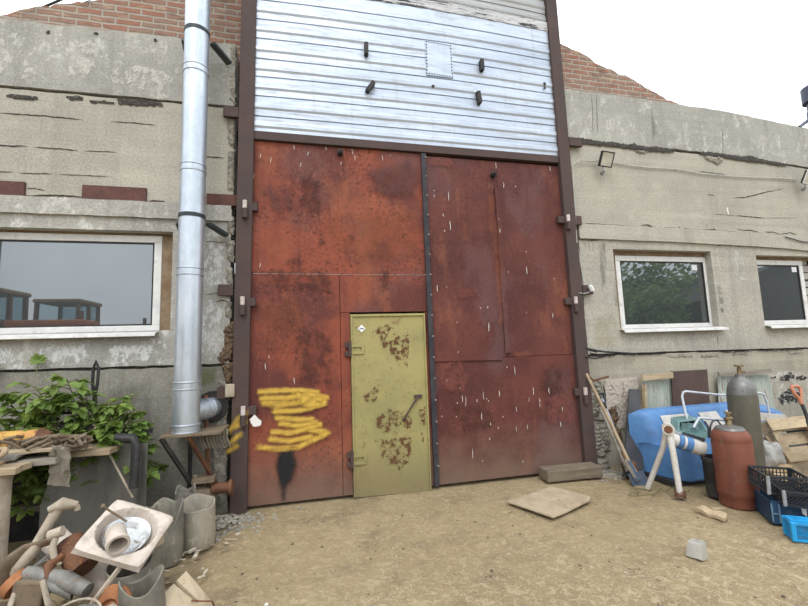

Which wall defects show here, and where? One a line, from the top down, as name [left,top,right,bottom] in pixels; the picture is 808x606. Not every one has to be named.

crack [6,112,82,120]
crack [0,144,110,152]
crack [0,171,108,197]
crack [706,189,796,247]
peeling [36,344,89,366]
peeling [109,344,154,363]
rust [373,324,409,368]
water stain [778,389,798,404]
rust [375,407,426,470]